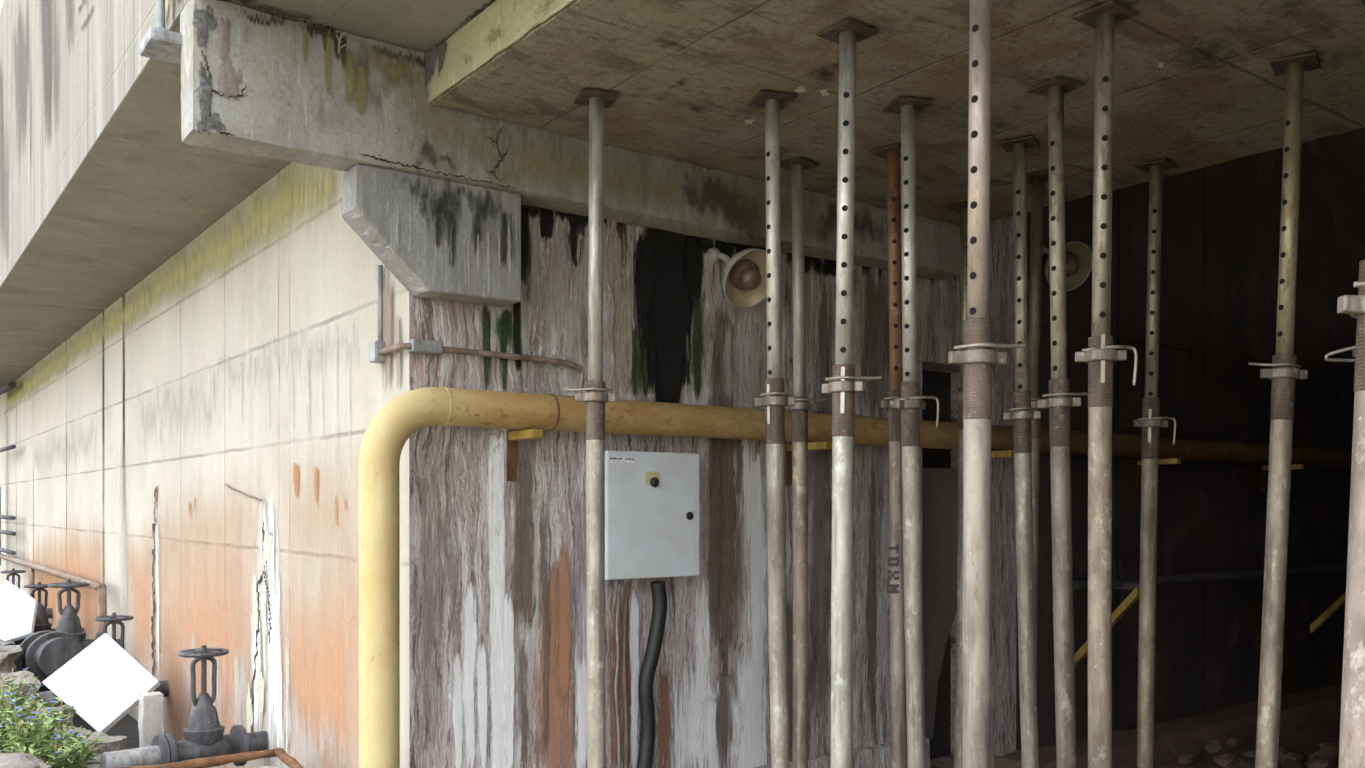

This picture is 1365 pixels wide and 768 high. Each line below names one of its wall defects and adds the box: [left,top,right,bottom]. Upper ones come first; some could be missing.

spalling [193,5,242,136]
leakage [240,0,426,113]
leakage [419,144,450,166]
crack [359,127,517,188]
leakage [821,204,837,237]
leakage [854,214,881,240]
leakage [424,177,766,409]
corrosion [293,464,318,504]
crack [150,486,158,677]
crack [224,483,273,732]